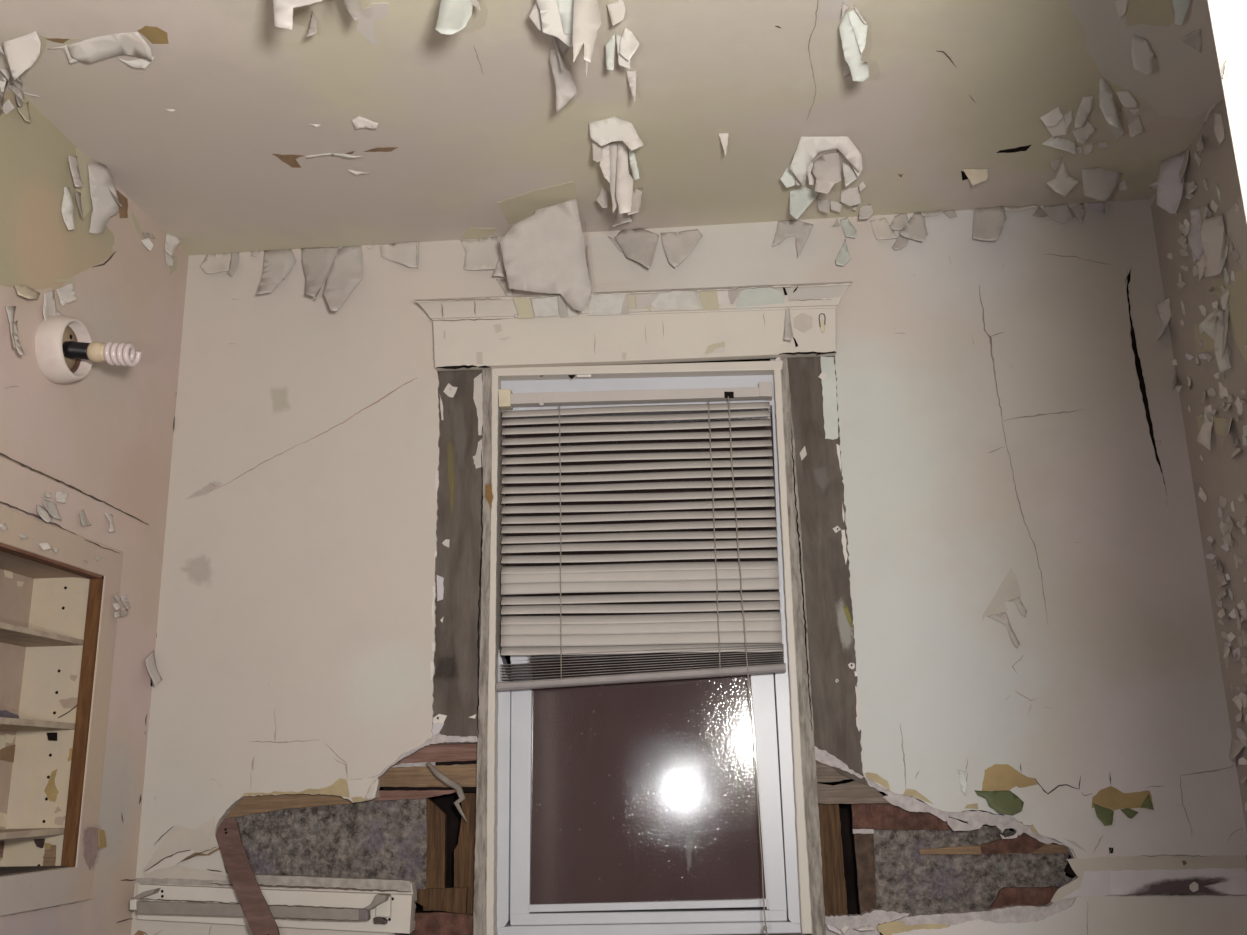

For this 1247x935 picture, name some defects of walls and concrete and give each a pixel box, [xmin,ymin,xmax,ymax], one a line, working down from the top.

peeling [273,0,322,37]
peeling [529,0,640,112]
crack [807,2,818,119]
peeling [0,26,181,355]
crack [208,295,559,492]
peeling [460,116,844,347]
crack [599,282,853,338]
peeling [773,136,957,266]
crack [1045,254,1167,503]
peeling [973,0,1247,842]
flaking render [225,714,478,935]
flaking render [815,746,1087,935]